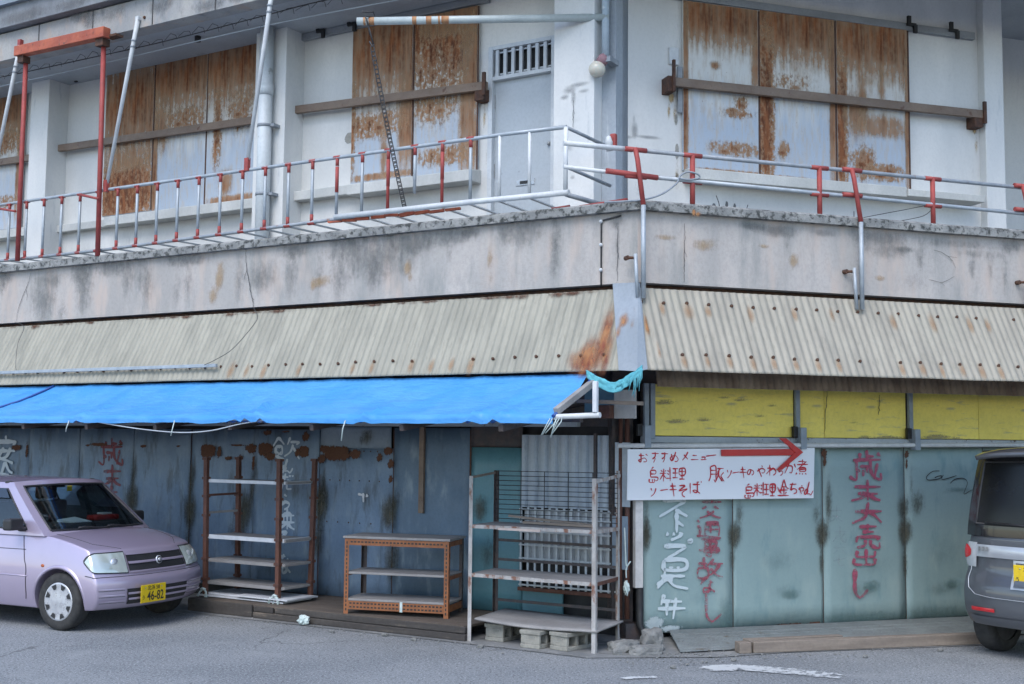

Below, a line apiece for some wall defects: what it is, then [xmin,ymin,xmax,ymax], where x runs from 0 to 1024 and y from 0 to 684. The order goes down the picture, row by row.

corrosion [102,43,257,216]
corrosion [351,5,478,182]
corrosion [668,0,909,188]
corrosion [573,316,626,373]
damp [817,487,831,568]